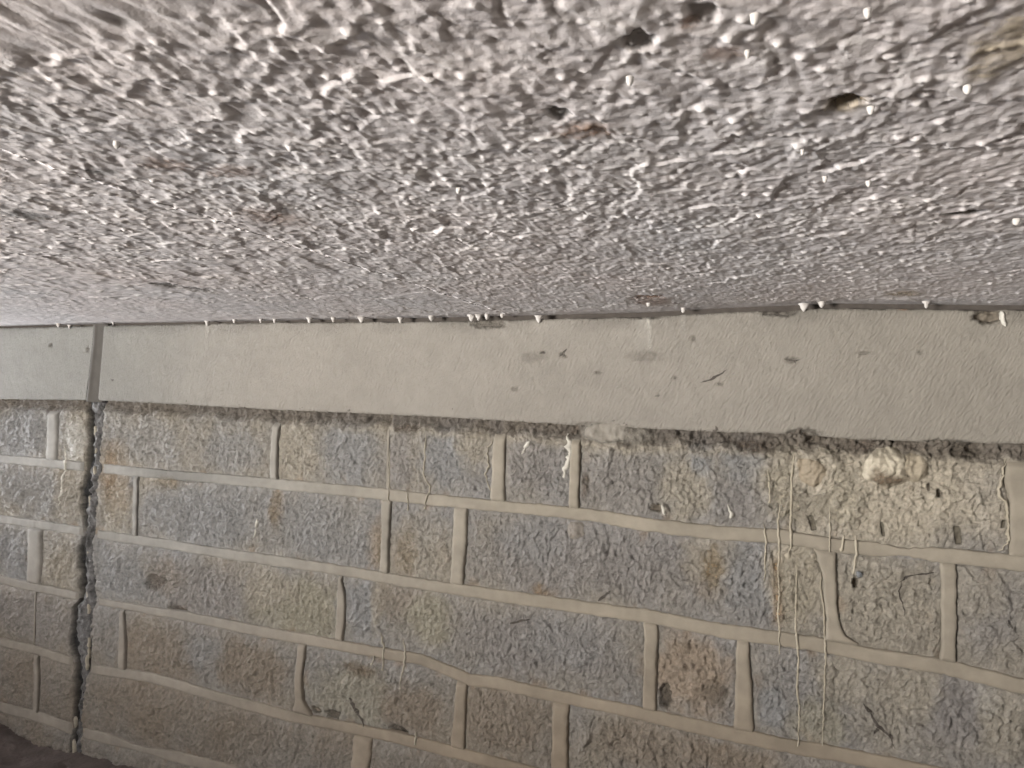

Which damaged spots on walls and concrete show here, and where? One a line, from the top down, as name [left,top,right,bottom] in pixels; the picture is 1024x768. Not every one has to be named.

spalling [790,429,826,444]
spalling [951,443,980,458]
leakage [829,505,858,574]
crack [72,402,107,753]
leakage [763,451,801,747]